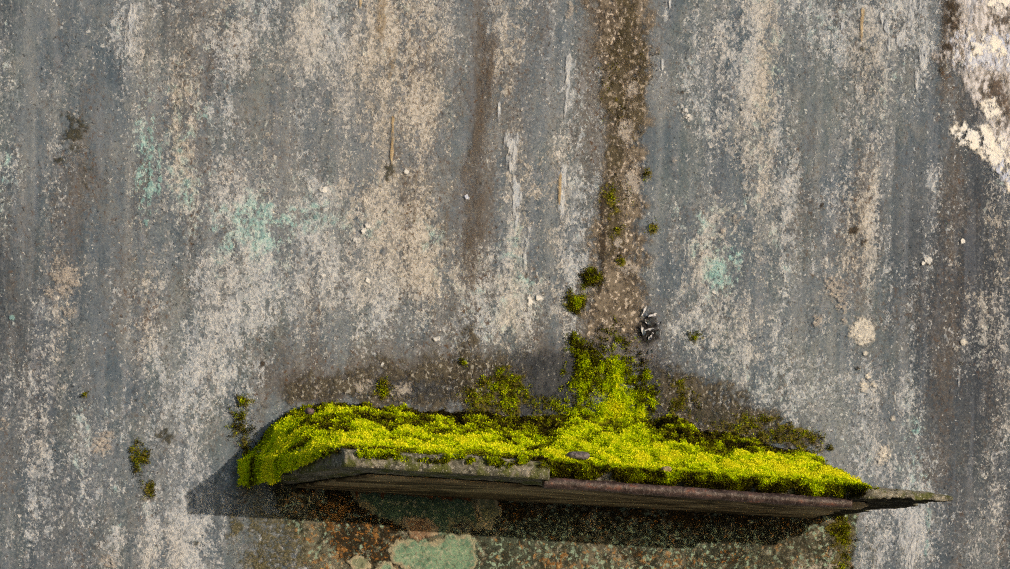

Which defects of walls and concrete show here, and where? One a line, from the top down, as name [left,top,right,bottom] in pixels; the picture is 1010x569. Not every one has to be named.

leakage [880,0,921,49]
leakage [915,0,961,89]
leakage [504,133,531,266]
leakage [558,164,567,216]
leakage [566,0,664,344]
peeling [346,491,502,569]